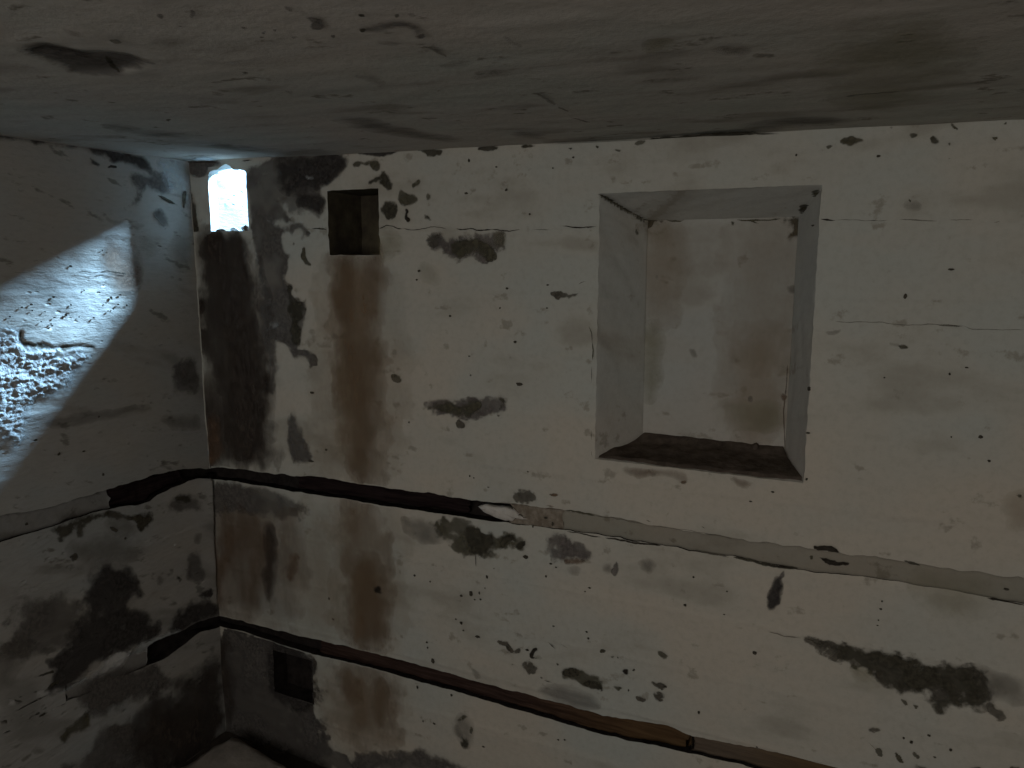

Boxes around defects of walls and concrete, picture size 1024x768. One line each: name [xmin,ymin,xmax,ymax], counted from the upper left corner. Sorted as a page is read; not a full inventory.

damp [418,149,442,157]
crack [379,224,596,232]
damp [68,145,430,469]
damp [52,510,153,542]
damp [434,516,525,564]
damp [0,556,455,768]
damp [804,637,1005,721]